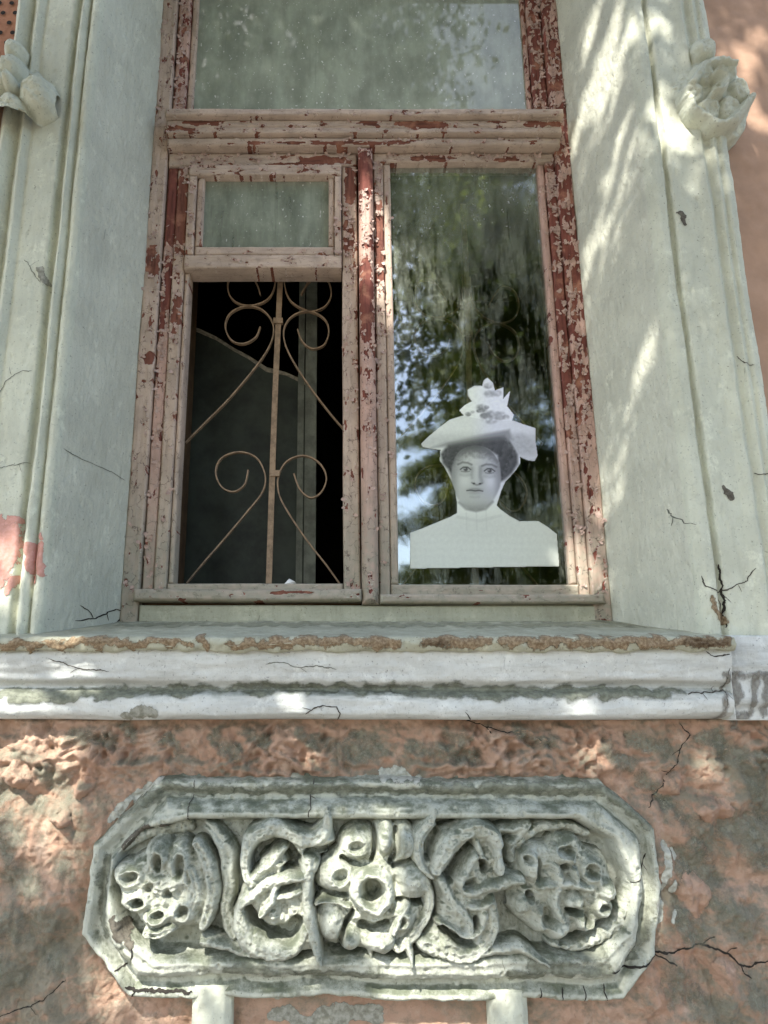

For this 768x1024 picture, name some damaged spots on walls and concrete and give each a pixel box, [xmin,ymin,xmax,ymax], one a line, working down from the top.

peeling [174,0,581,458]
peeling [138,210,212,467]
peeling [556,330,591,466]
peeling [0,514,47,596]
crack [75,605,121,622]
peeling [565,480,608,573]
crack [701,564,756,628]
crack [48,658,109,672]
leakage [0,680,684,705]
crack [648,722,690,808]
crack [539,936,768,1001]